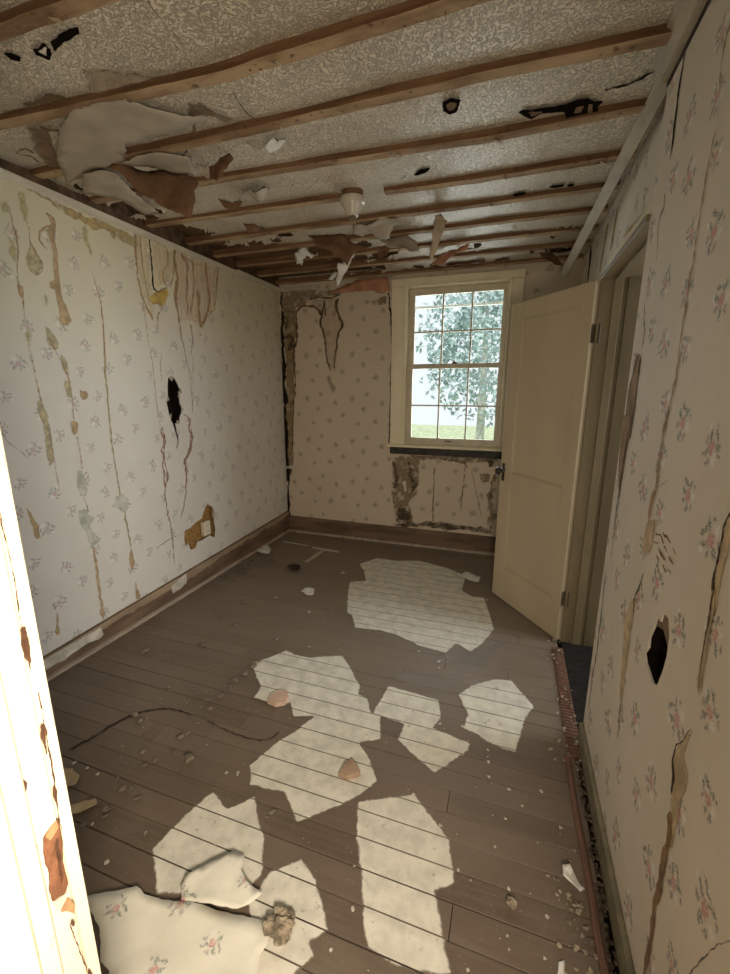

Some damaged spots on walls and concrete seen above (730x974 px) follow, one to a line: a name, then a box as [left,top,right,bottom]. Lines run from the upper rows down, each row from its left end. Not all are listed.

damp [3,189,218,352]
damp [32,361,59,484]
damp [46,327,105,618]
damp [94,279,135,570]
spalling [167,376,183,424]
spalling [184,504,215,550]
spalling [647,615,669,684]